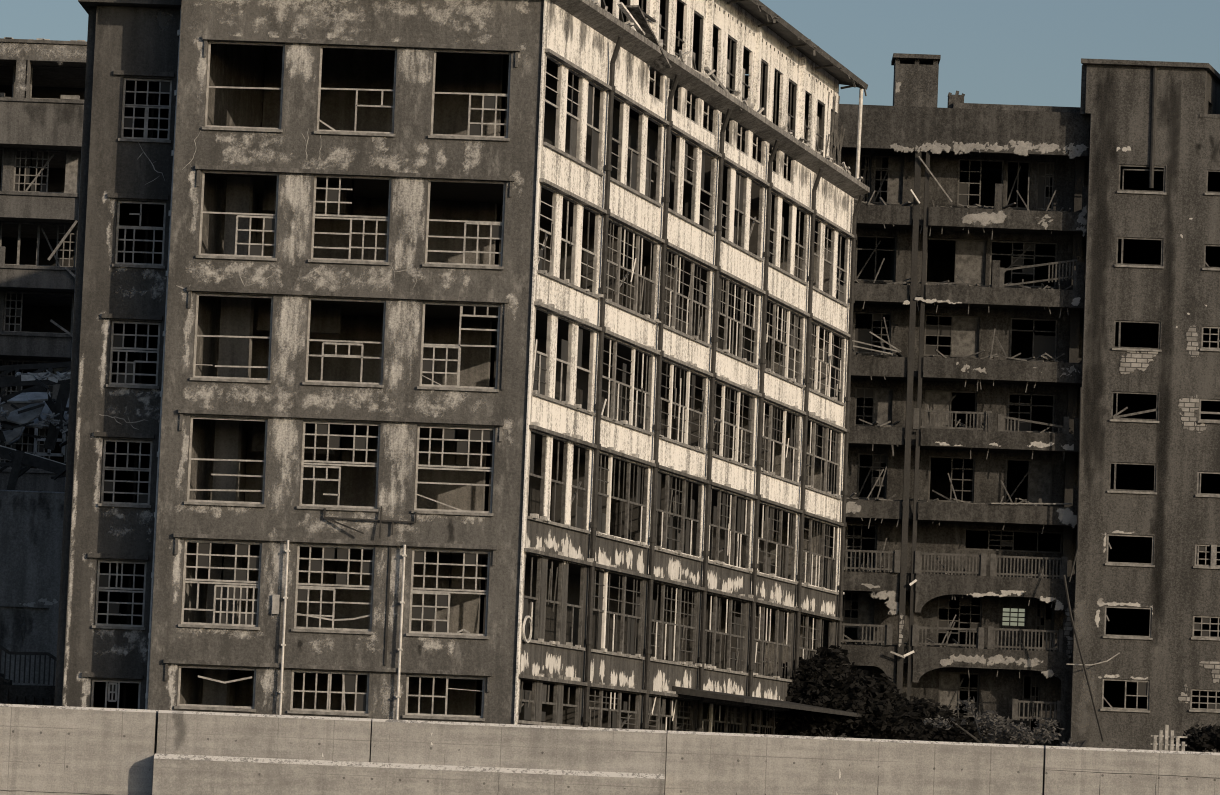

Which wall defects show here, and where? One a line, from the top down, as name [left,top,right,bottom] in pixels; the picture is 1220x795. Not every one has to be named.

spalling [890,140,1089,159]
spalling [961,210,1007,226]
water stain [1163,86,1179,305]
water stain [1083,73,1113,478]
peeling [518,22,846,719]
flaking render [1119,351,1158,374]
flaking render [1177,395,1207,433]
spalling [807,485,862,521]
water stain [1152,371,1170,615]
spalling [861,583,904,647]
flaking render [1040,593,1153,658]
spalling [940,654,1054,678]